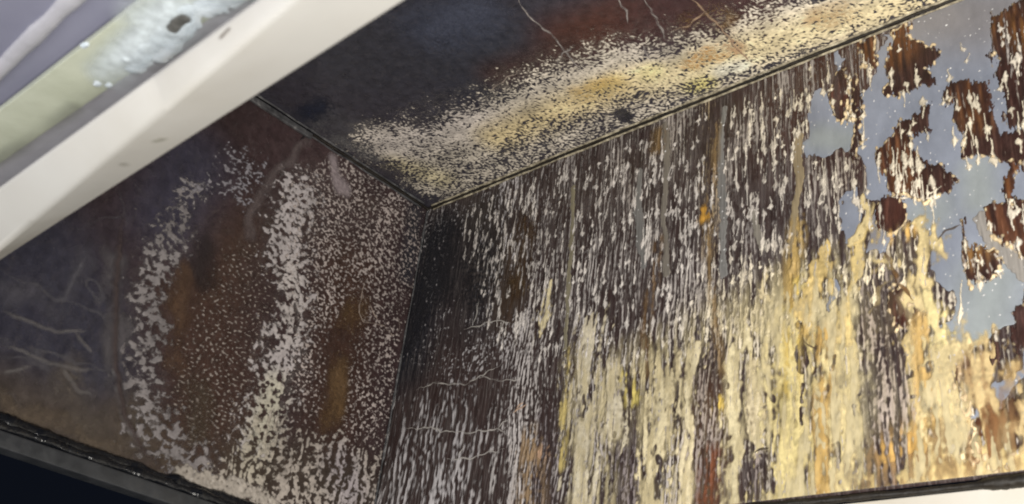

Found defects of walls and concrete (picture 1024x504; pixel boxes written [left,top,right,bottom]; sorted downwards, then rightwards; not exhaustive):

damp [219,0,1004,504]
peeling [802,0,1024,347]
damp [983,18,1024,178]
damp [987,220,1022,260]
damp [991,190,1024,230]
damp [168,241,276,447]
damp [932,326,1023,473]